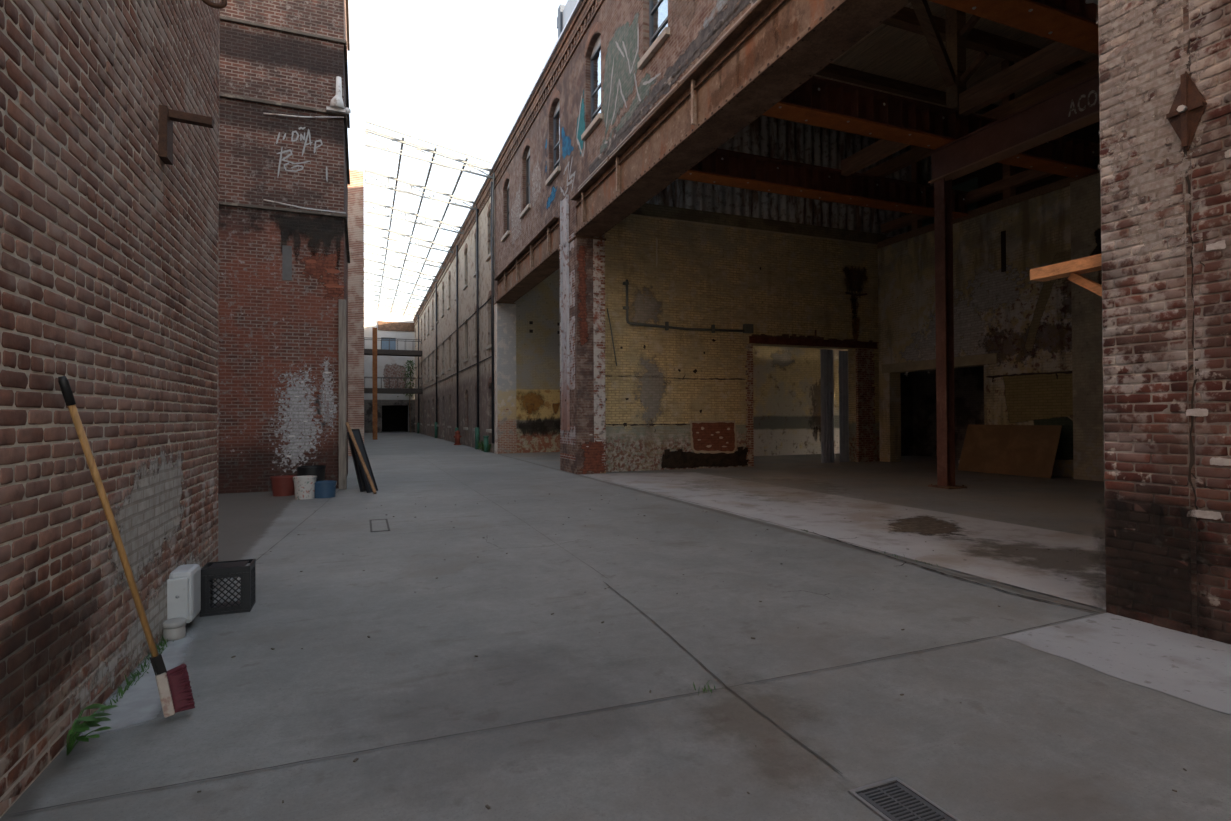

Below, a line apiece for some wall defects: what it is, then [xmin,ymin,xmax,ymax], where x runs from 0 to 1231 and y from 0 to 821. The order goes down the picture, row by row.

water stain [278,213,346,270]
spalling [577,243,623,349]
spalling [977,277,1072,368]
spalling [690,410,737,454]
water stain [1100,500,1210,630]